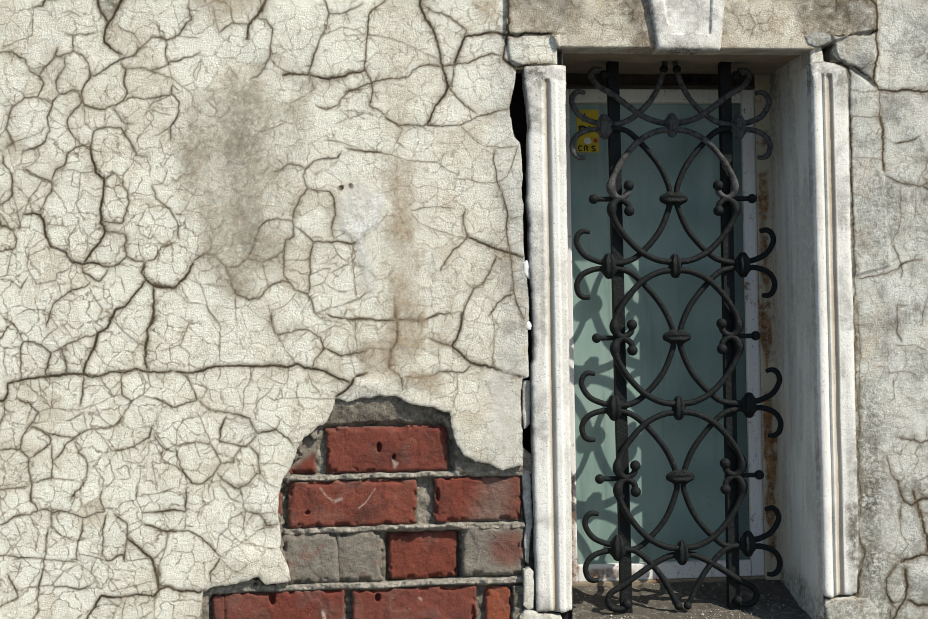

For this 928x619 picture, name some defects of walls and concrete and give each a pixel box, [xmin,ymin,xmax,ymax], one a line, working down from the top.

crack [0,0,557,619]
flaking render [200,396,553,619]
flaking render [521,380,531,429]
rust [760,312,772,367]
rust [763,394,776,557]
crack [831,0,928,619]